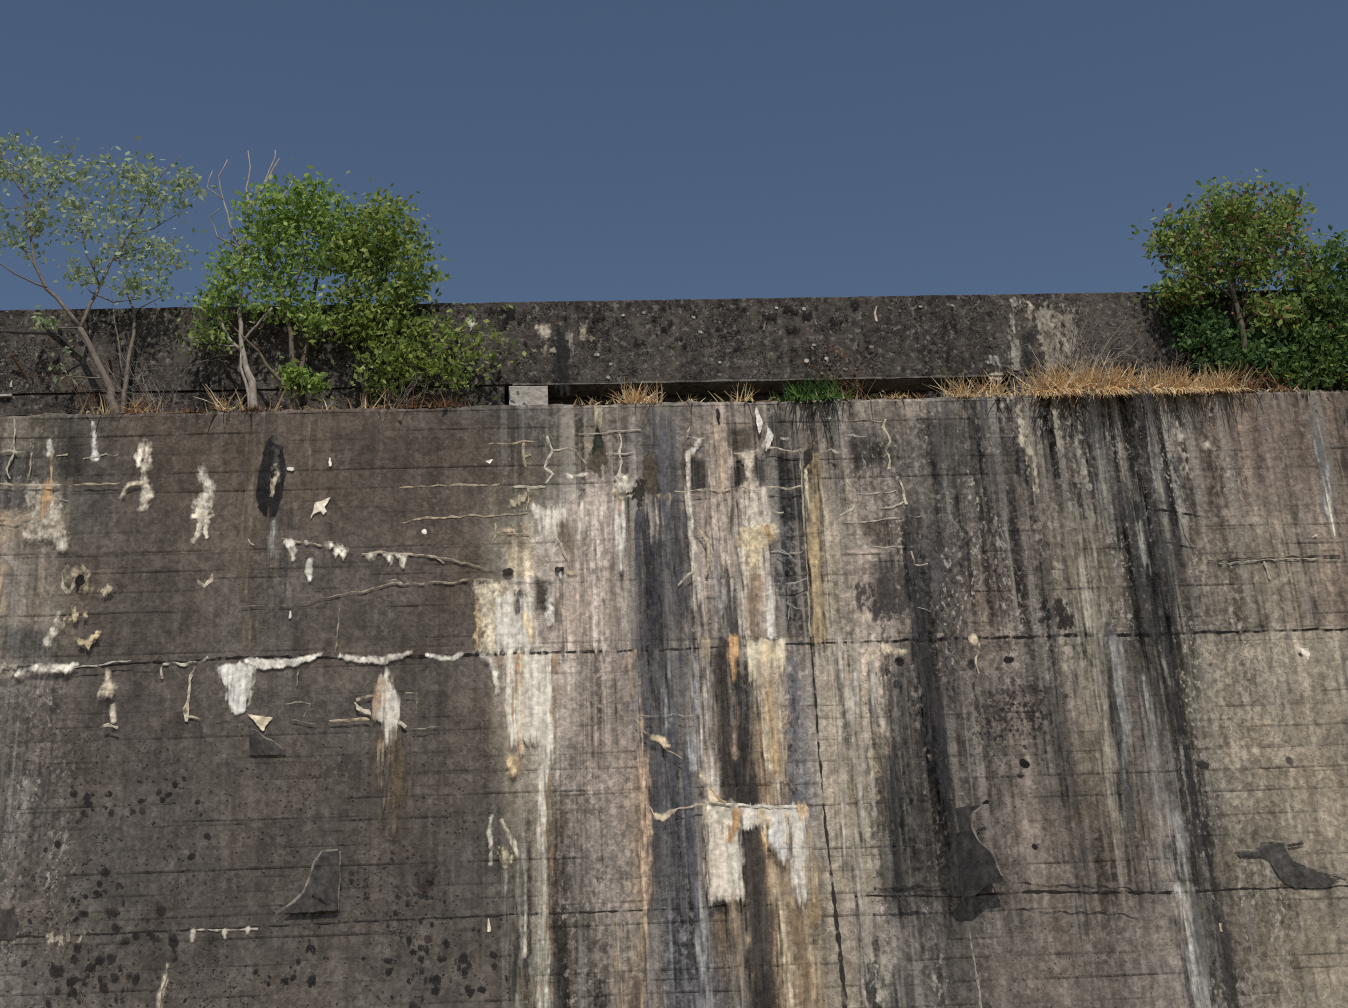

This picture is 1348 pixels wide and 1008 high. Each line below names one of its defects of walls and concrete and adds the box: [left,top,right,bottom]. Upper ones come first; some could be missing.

damp [83,421,107,461]
damp [191,468,215,542]
damp [311,497,330,518]
damp [305,558,313,581]
damp [0,660,131,729]
damp [160,653,322,722]
damp [494,403,818,1008]
crack [0,418,1348,1008]
damp [833,391,980,1008]
damp [1042,386,1240,1008]
damp [329,581,566,1008]
damp [190,926,258,942]